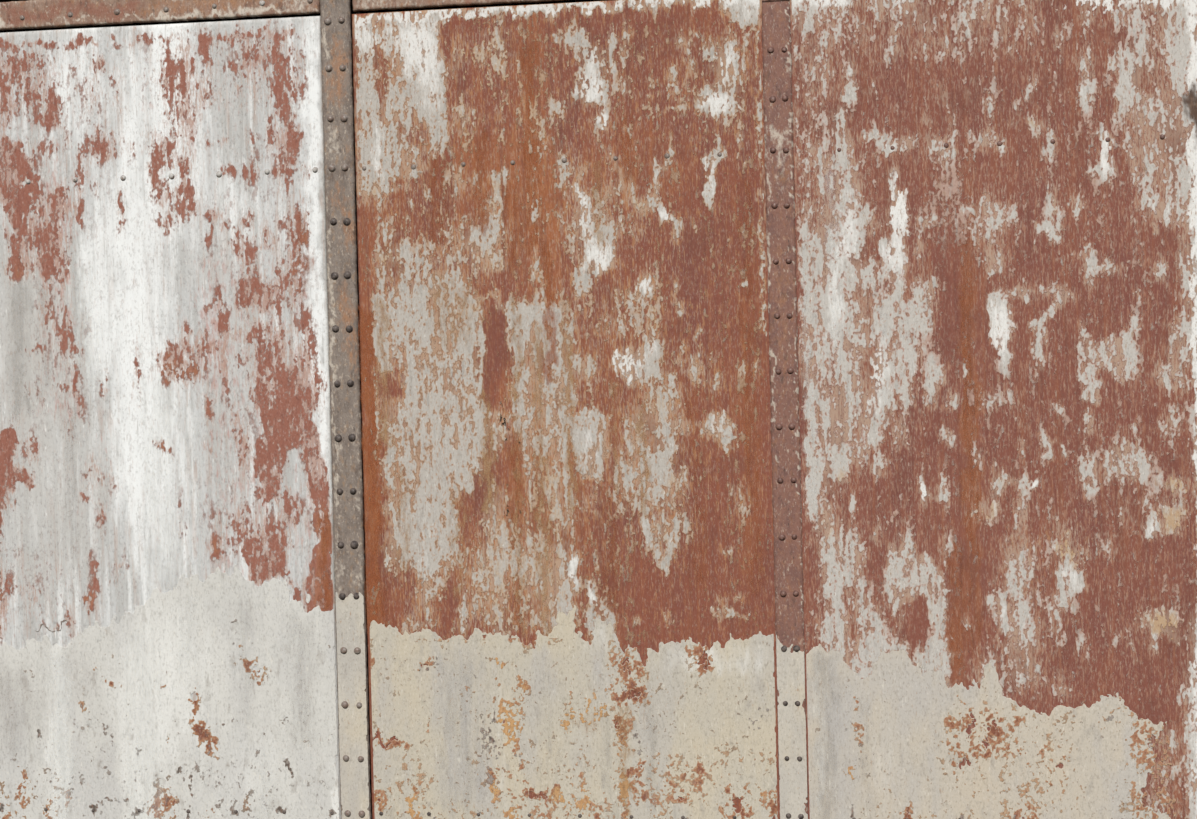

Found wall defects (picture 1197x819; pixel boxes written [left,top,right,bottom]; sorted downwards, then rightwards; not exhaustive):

rust [1183,85,1197,128]
rust [540,286,556,382]
peeling [791,0,1197,819]
rust [361,304,386,622]
peeling [83,797,145,819]
peeling [176,765,200,819]
rust [188,687,220,760]
peeling [215,776,252,816]
peeling [474,711,522,785]
rust [374,638,778,819]
rust [860,695,1086,819]
rust [1098,697,1179,819]